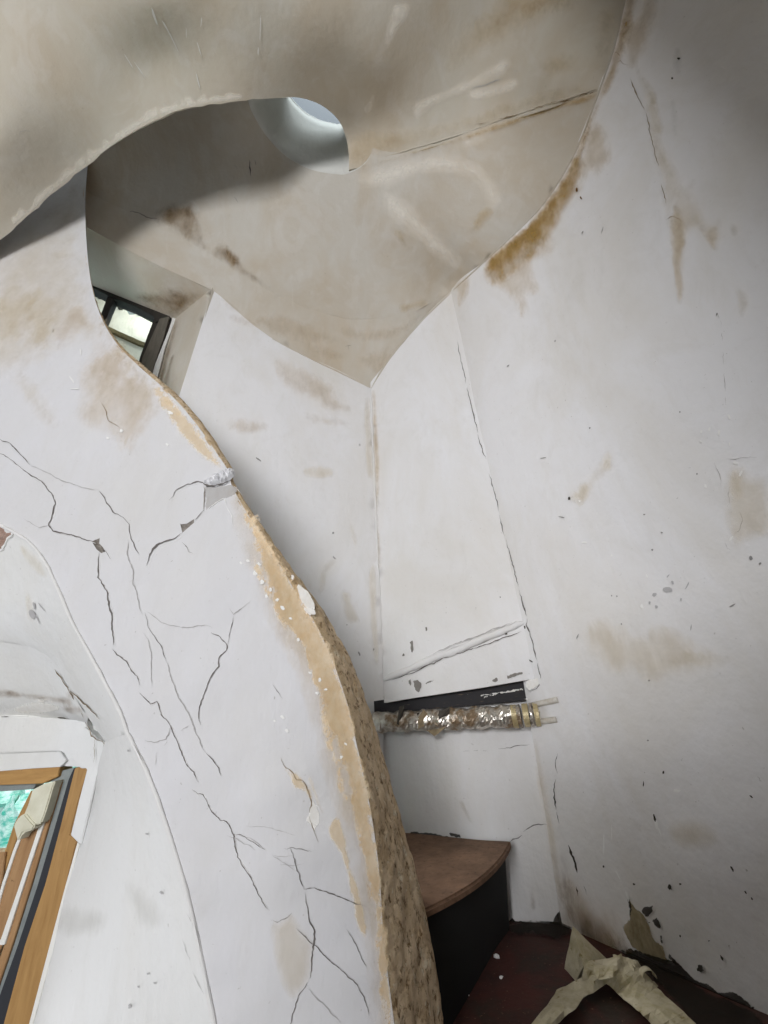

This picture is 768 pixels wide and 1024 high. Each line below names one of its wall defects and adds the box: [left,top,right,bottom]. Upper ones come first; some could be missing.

damp [487,159,581,284]
crack [615,52,682,222]
crack [458,345,541,692]
damp [263,565,309,662]
crack [0,439,369,1023]
peeling [154,387,391,1024]
damp [321,688,360,819]
flaking render [623,899,754,1009]